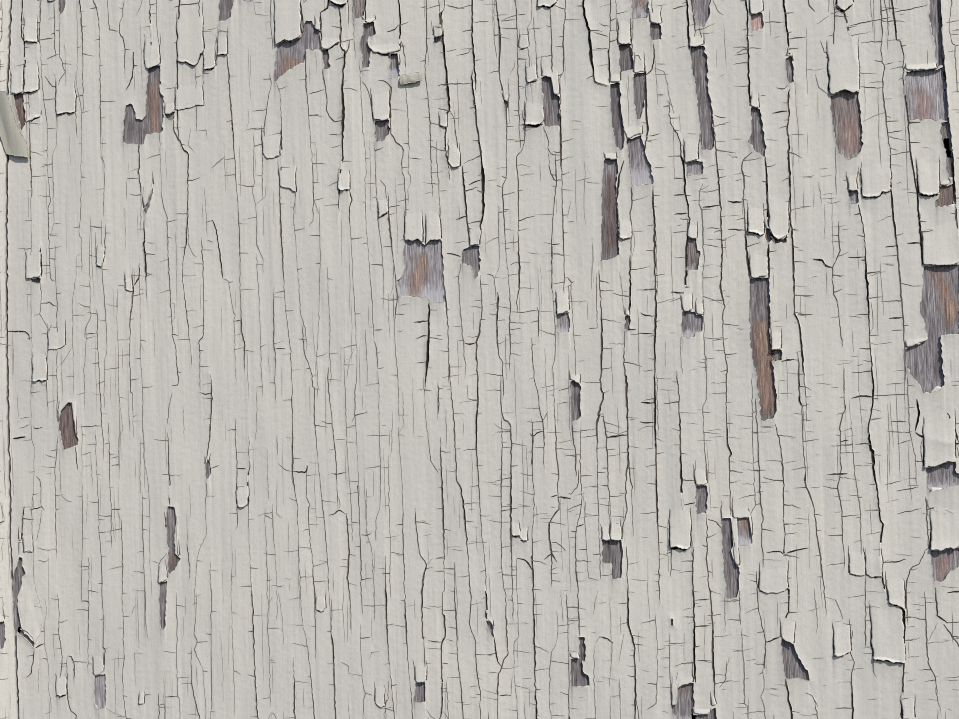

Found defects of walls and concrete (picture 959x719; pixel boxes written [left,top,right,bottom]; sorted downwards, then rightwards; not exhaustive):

crack [0,0,290,719]
peeling [123,24,204,144]
peeling [274,0,341,81]
peeling [397,207,446,303]
peeling [601,0,662,261]
peeling [683,0,715,176]
peeling [747,190,790,420]
peeling [826,0,892,204]
peeling [903,0,959,393]
crack [927,0,959,120]
crack [940,149,958,228]
peeling [721,498,753,599]